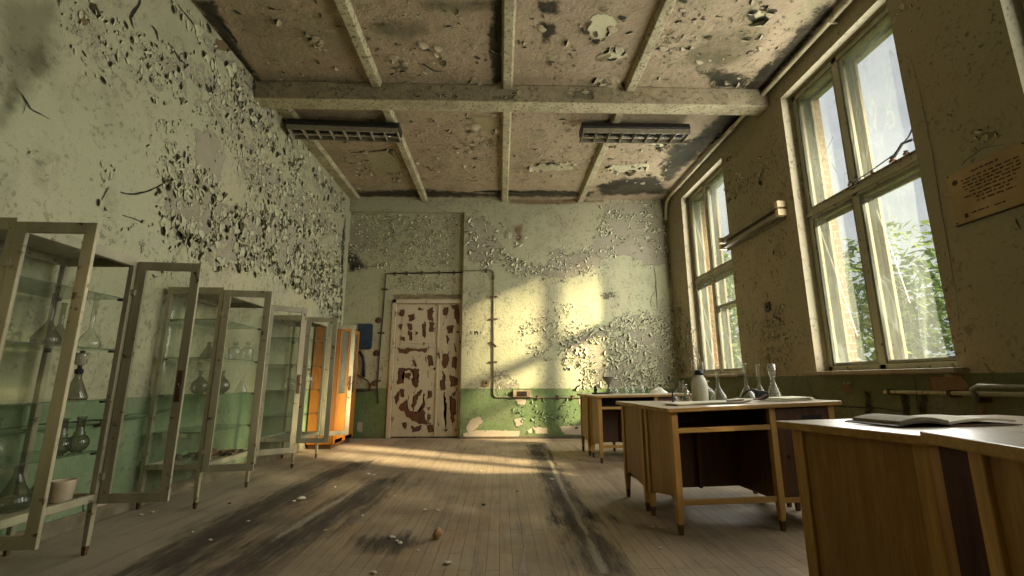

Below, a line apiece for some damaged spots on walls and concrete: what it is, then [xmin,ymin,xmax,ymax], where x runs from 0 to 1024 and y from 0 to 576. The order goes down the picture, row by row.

damp [701,5,833,89]
crack [16,88,49,119]
damp [357,115,741,198]
crack [102,178,173,223]
peeling [58,0,696,437]